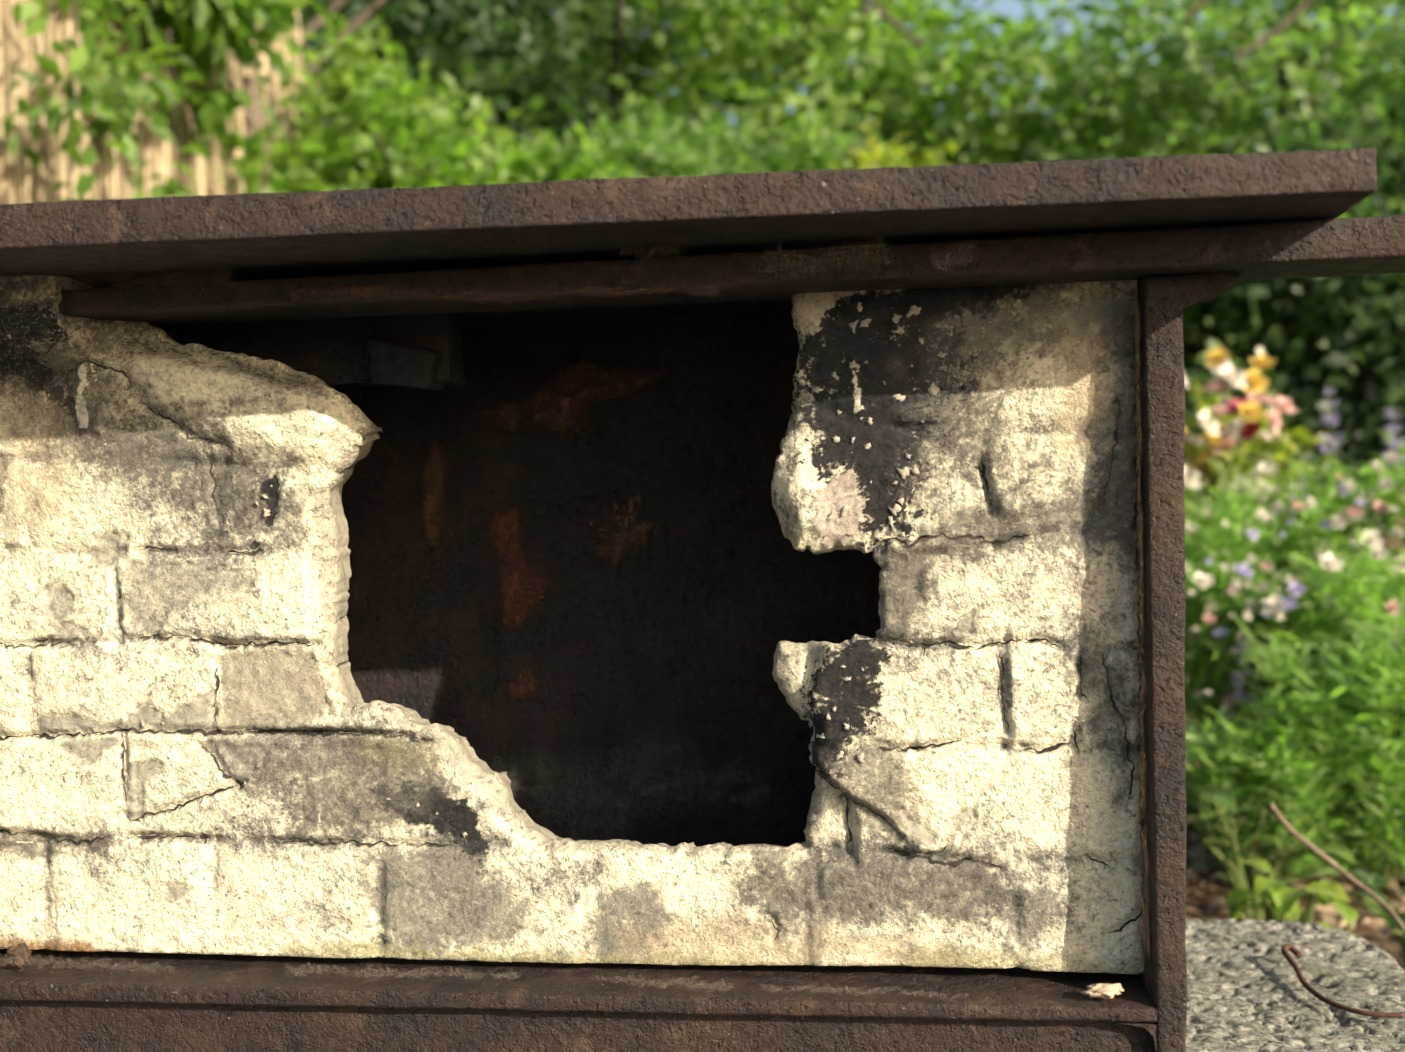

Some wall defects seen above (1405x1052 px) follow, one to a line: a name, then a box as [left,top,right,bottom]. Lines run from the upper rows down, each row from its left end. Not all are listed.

peeling [797,360,868,394]
leakage [852,370,864,412]
spalling [810,453,919,549]
crack [874,318,1145,949]
peeling [836,751,865,763]